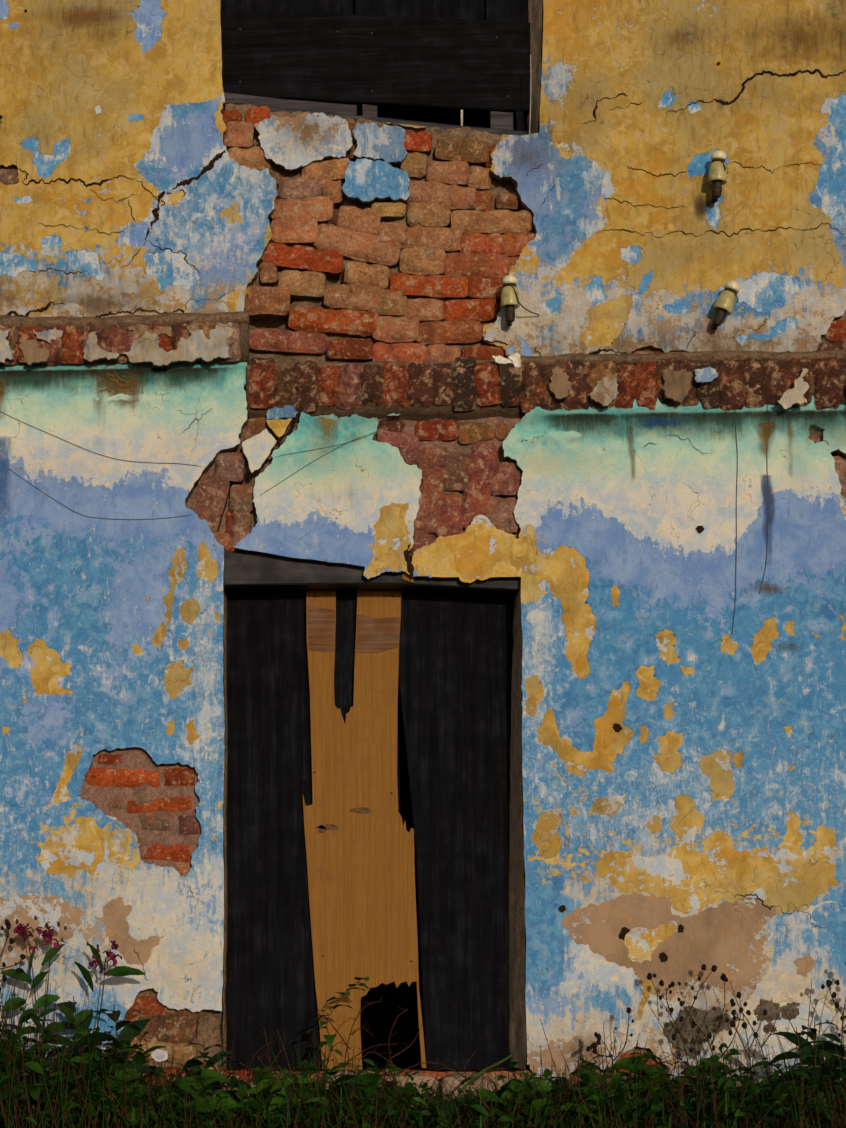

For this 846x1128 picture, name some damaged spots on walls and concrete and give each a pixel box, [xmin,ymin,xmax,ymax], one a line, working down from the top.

crack [584,66,846,124]
crack [0,150,234,317]
spalling [222,103,536,364]
crack [627,166,696,177]
crack [600,198,846,238]
crack [727,161,819,173]
water stain [0,368,216,388]
water stain [0,439,8,503]
spalling [129,405,300,701]
peeling [521,625,746,805]
spalling [37,739,202,879]
peeling [561,792,846,1081]